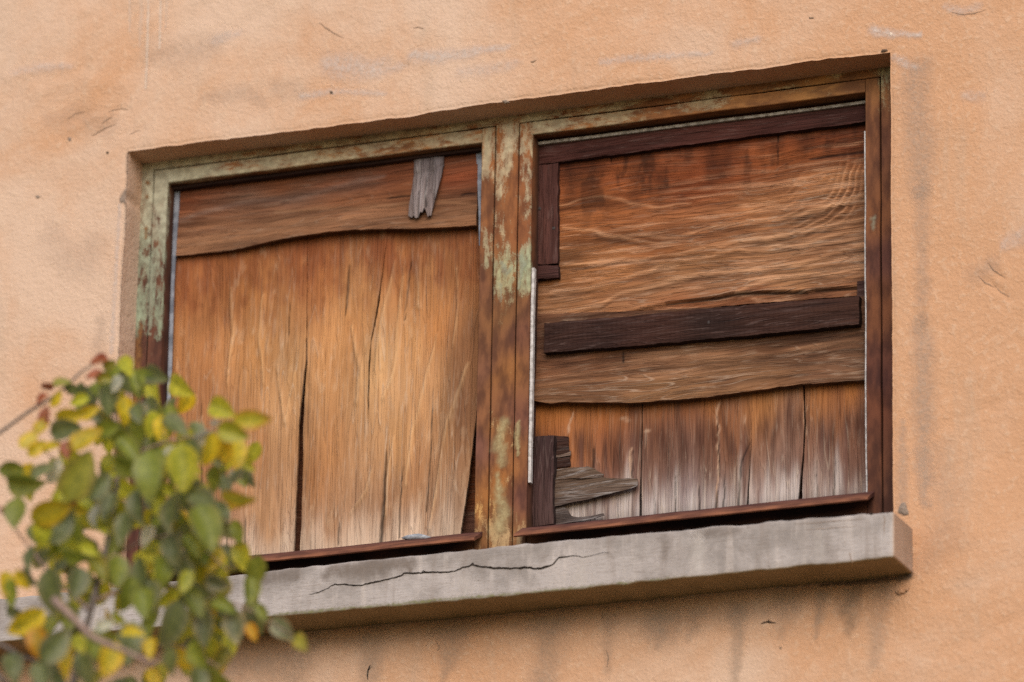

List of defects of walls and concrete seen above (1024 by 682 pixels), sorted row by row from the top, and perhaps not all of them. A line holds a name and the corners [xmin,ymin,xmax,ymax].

crack [313,552,608,594]